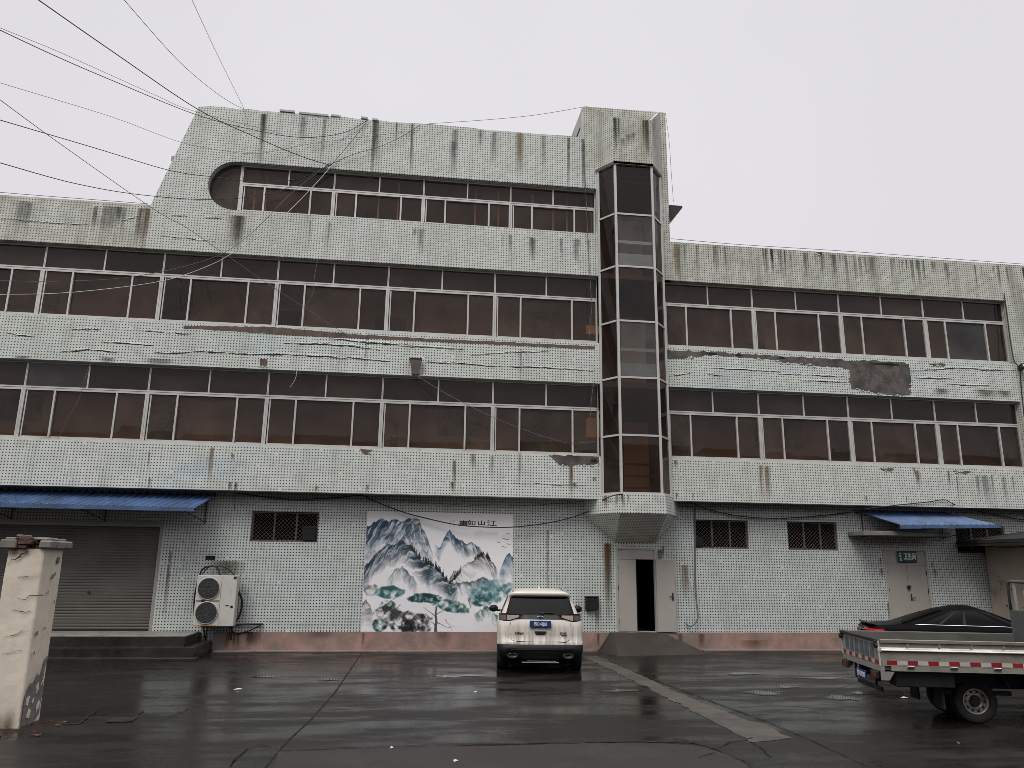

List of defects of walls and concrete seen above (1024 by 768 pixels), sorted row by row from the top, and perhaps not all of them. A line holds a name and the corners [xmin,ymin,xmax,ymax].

peeling [667,350,912,397]
peeling [549,454,600,467]
crack [2,551,43,654]